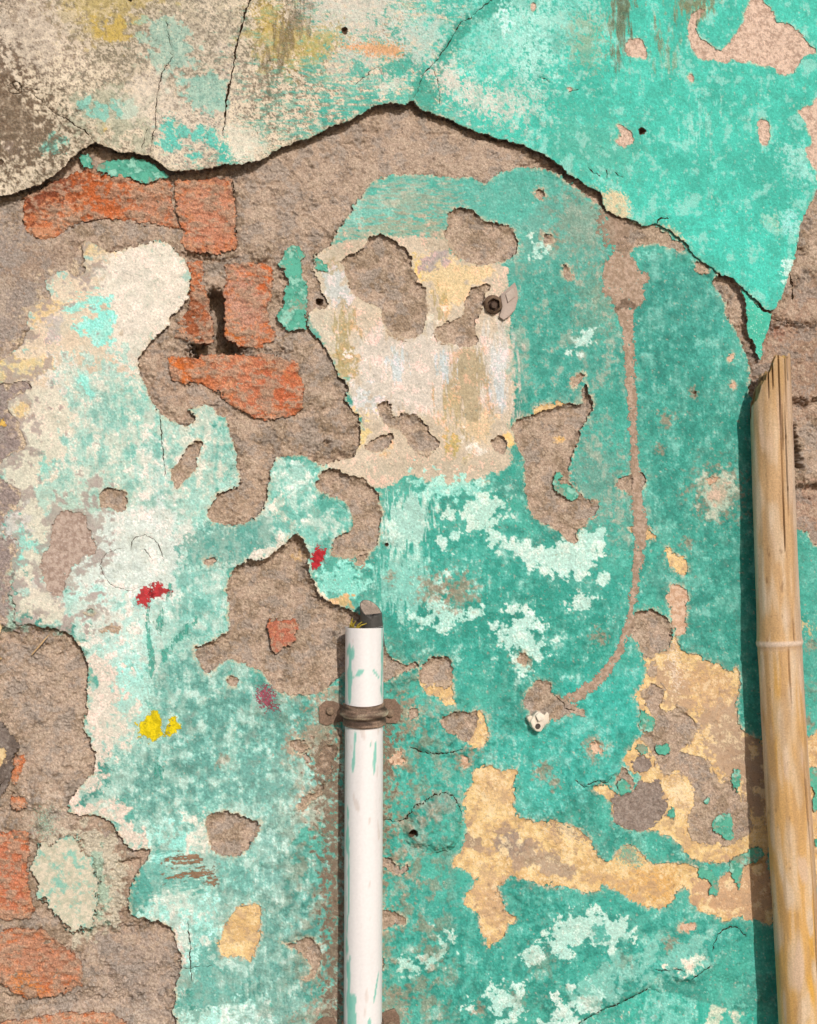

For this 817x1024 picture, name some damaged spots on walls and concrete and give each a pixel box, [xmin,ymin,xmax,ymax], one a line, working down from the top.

crack [141,22,173,150]
crack [222,0,251,132]
peeling [688,0,816,76]
flaking render [0,101,685,570]
spalling [195,533,361,696]
spalling [0,477,182,1024]
spalling [205,810,261,857]
spalling [290,739,338,812]
peeling [382,547,773,948]
peeling [217,903,263,962]
spalling [286,937,323,982]
crack [578,926,746,1024]